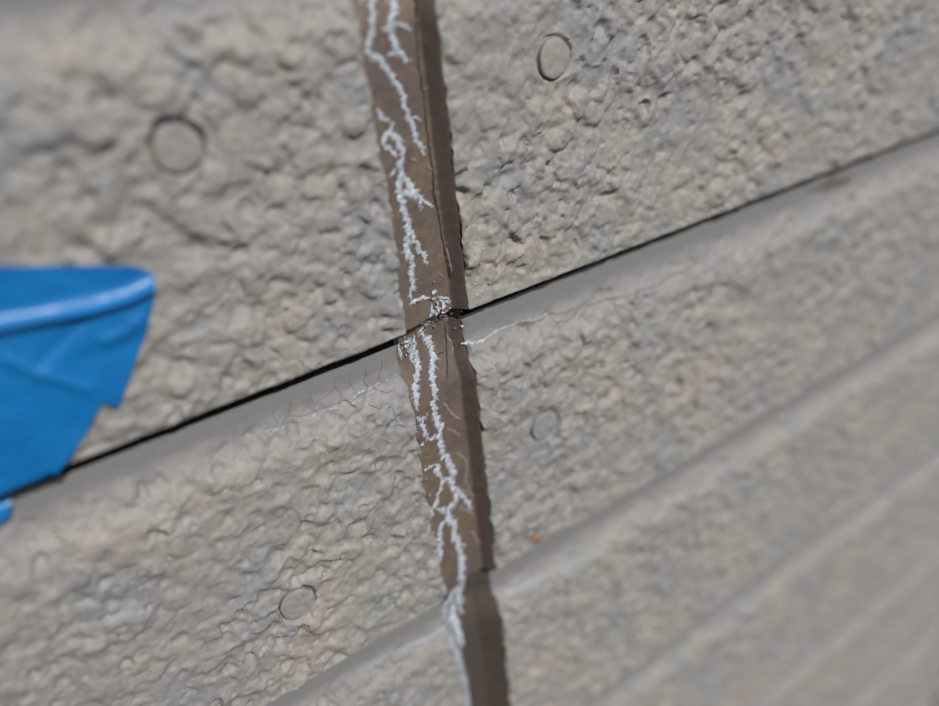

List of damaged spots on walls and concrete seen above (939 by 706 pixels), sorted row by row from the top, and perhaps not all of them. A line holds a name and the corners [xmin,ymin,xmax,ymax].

peeling [401,242,464,356]
crack [246,0,707,589]
peeling [441,584,466,652]